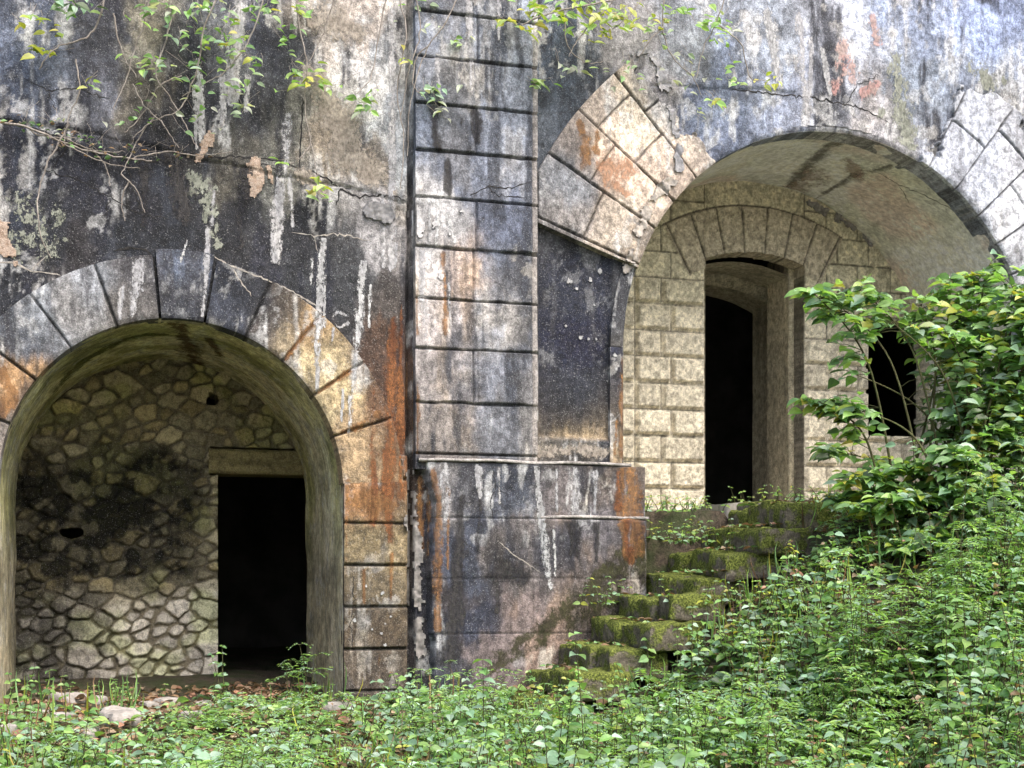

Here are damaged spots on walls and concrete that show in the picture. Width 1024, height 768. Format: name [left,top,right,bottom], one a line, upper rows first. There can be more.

spalling [187,130,215,163]
crack [0,70,405,221]
spalling [246,156,273,198]
damp [270,113,294,263]
crack [730,74,889,123]
damp [117,258,144,320]
damp [201,190,215,317]
corrosion [284,318,319,362]
corrosion [318,369,354,393]
corrosion [341,310,451,632]
damp [534,466,600,590]
corrosion [614,359,645,564]